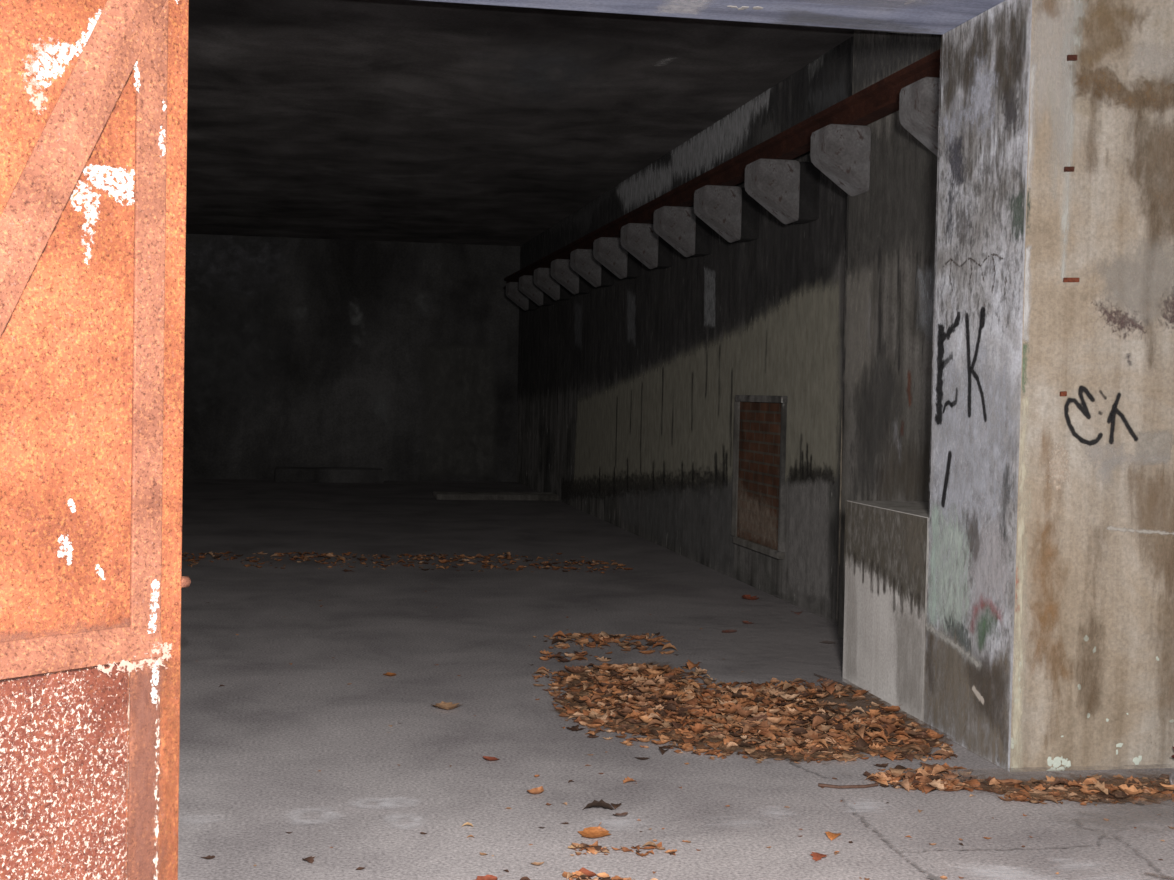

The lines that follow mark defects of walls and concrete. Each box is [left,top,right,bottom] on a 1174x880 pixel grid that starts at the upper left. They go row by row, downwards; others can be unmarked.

leakage [984,33,1025,130]
leakage [1038,0,1174,178]
leakage [846,125,970,297]
leakage [1010,192,1025,241]
leakage [1136,127,1174,240]
leakage [561,444,732,499]
leakage [790,290,934,573]
leakage [966,519,979,559]
leakage [854,549,1009,771]
crack [786,759,1174,880]